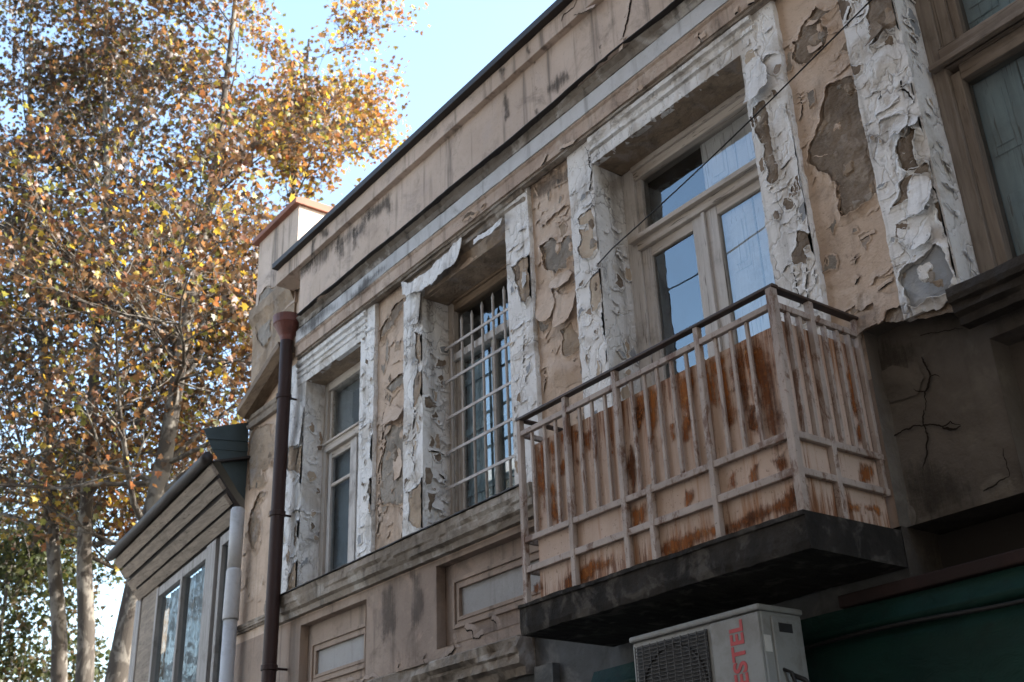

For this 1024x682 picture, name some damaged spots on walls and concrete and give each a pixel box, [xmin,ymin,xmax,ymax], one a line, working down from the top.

spalling [743,0,977,343]
spalling [506,161,640,436]
peeling [282,403,324,591]
spalling [356,218,502,557]
rust [627,445,637,494]
rust [636,390,658,448]
rust [670,374,694,442]
rust [661,484,809,556]
rust [705,344,787,472]
rust [860,464,874,483]
crack [894,328,961,470]
crack [983,450,1010,491]